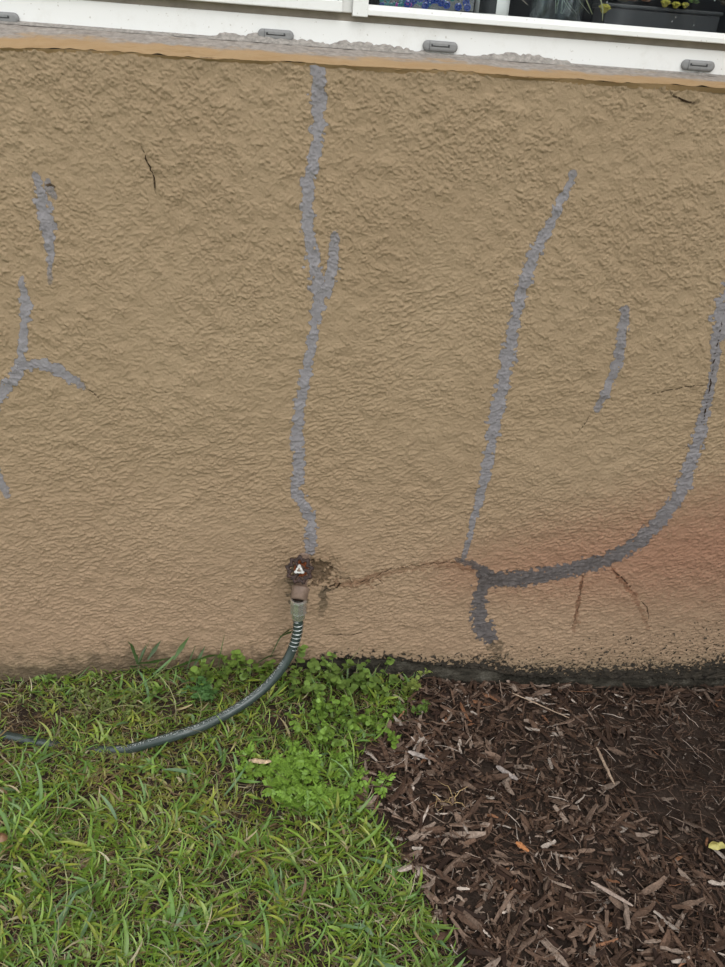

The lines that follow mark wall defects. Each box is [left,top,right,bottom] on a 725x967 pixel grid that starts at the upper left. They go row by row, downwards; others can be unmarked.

crack [32,171,58,274]
crack [0,276,99,403]
crack [289,65,341,556]
crack [351,170,725,645]
crack [0,469,11,499]
leakage [295,621,725,681]